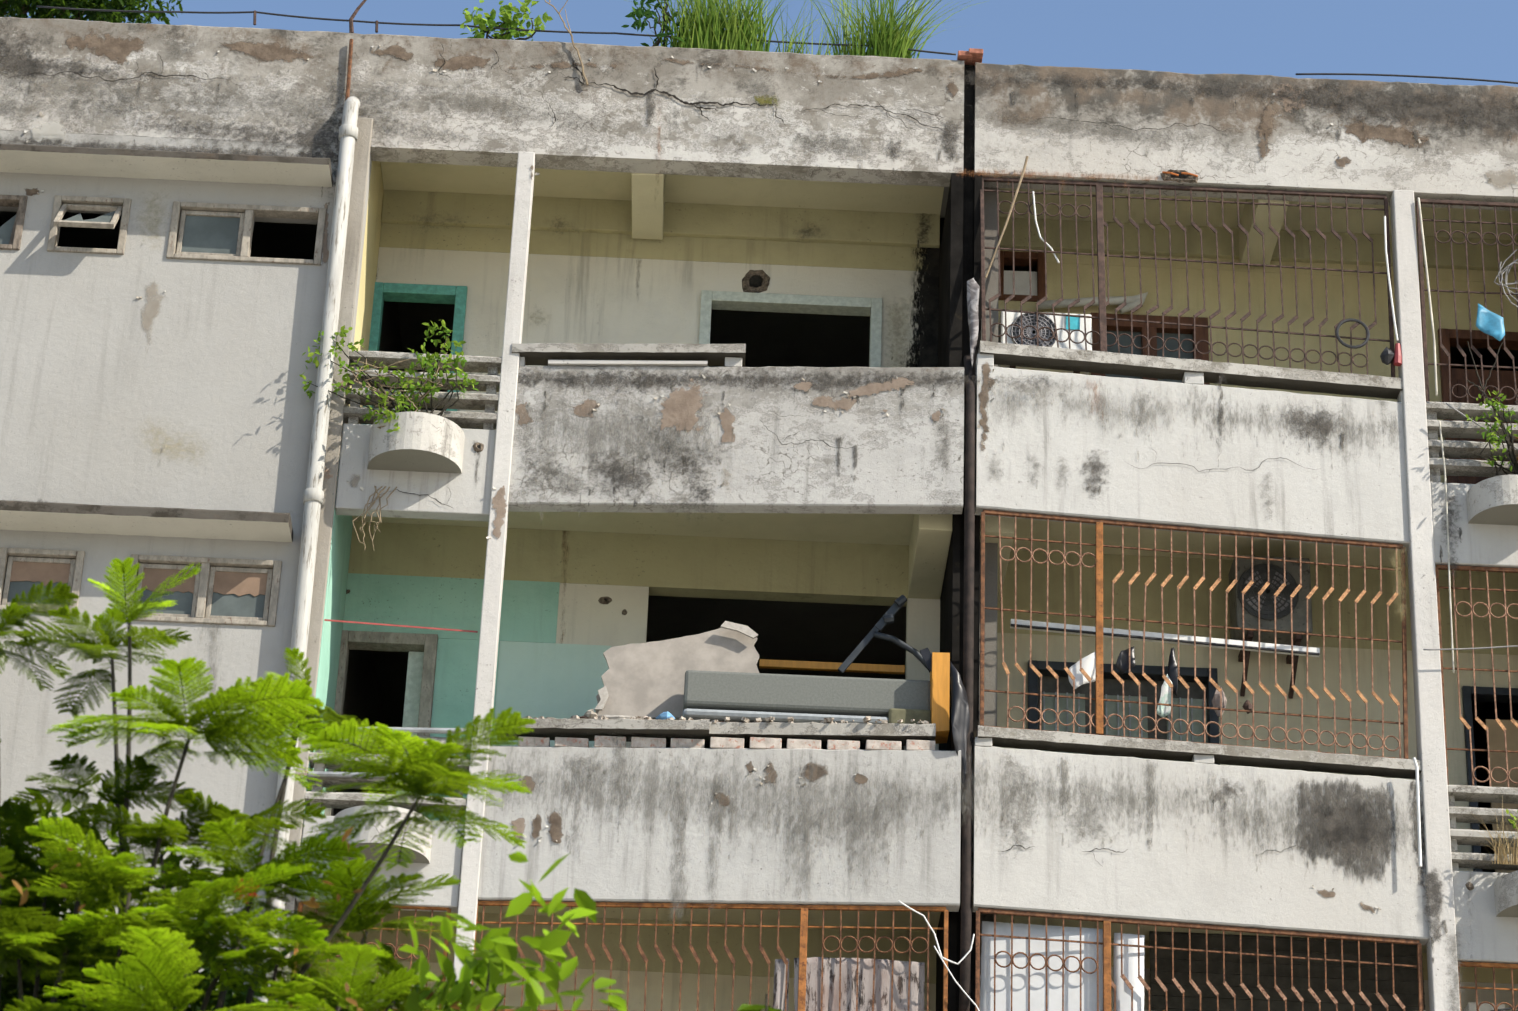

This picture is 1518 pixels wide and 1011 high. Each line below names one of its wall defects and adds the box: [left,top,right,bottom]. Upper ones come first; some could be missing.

spalling [59,29,149,69]
spalling [217,39,313,66]
crack [491,48,961,143]
damp [965,72,1518,150]
peeling [654,373,735,443]
damp [518,369,1049,513]
damp [1193,374,1396,449]
peeling [486,486,507,539]
spalling [745,761,778,786]
spalling [511,811,563,844]
damp [505,738,976,915]
damp [1001,761,1462,1010]